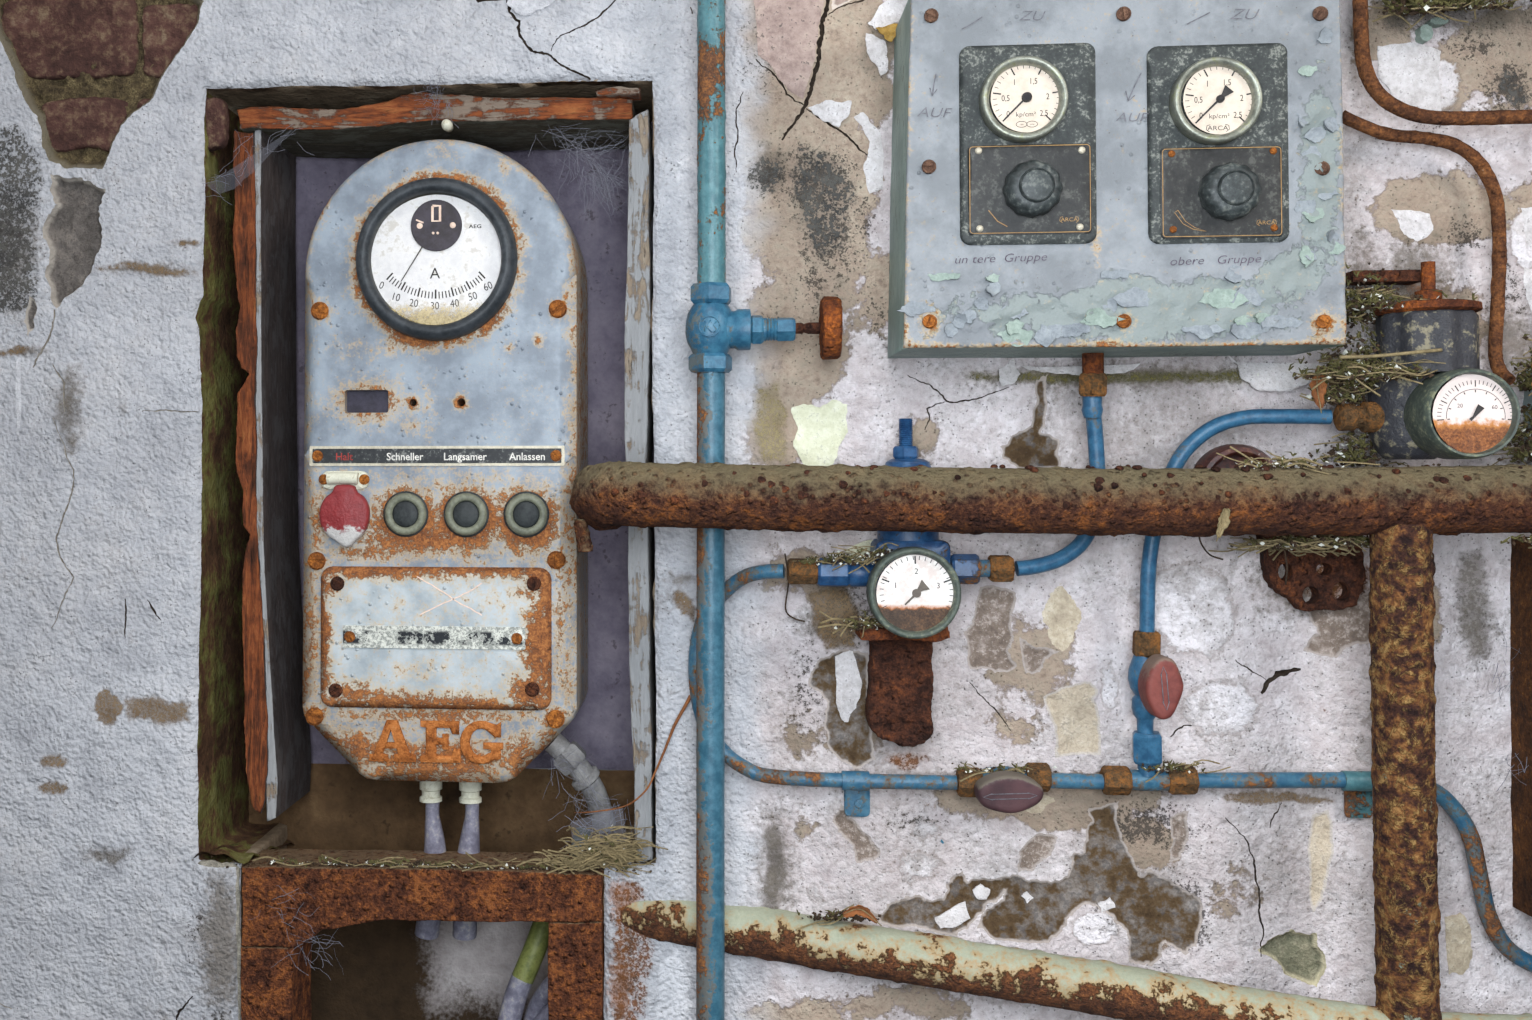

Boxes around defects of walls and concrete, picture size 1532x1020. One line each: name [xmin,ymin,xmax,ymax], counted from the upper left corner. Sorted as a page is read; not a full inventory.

leakage [0,124,44,313]
flaking render [0,0,204,338]
flaking render [205,97,229,152]
crack [476,0,616,80]
crack [734,0,868,172]
leakage [747,144,858,256]
peeling [1377,42,1442,111]
peeling [1391,209,1433,241]
crack [33,309,75,628]
peeling [791,400,848,466]
crack [1235,660,1300,694]
peeling [871,801,1203,966]